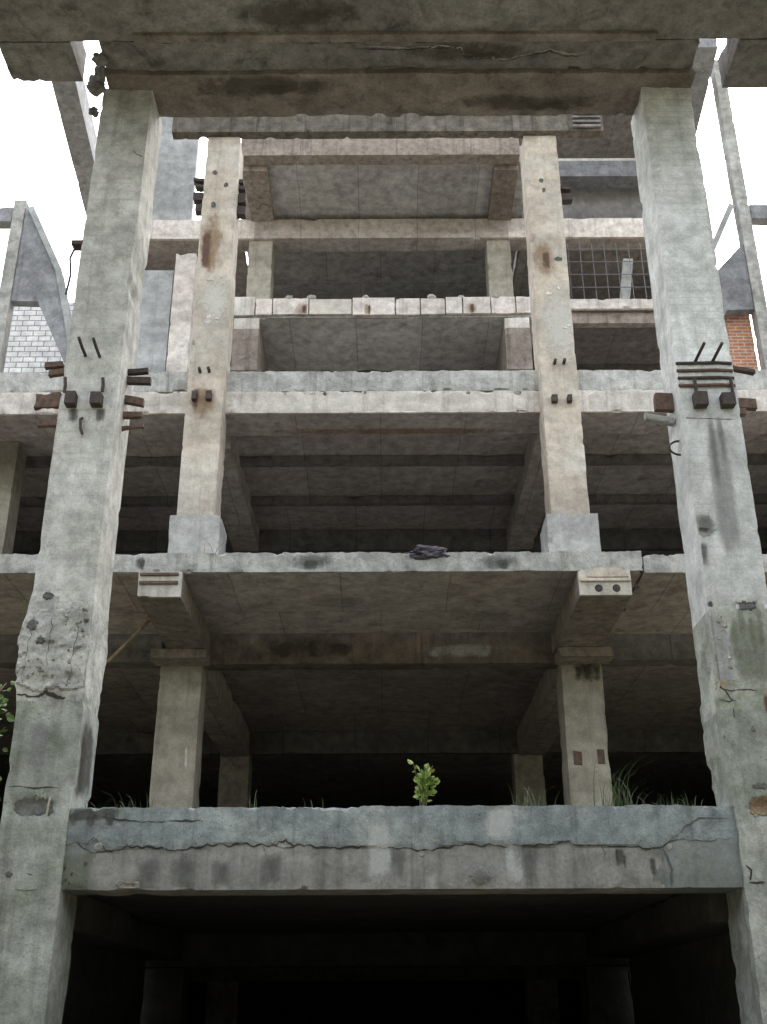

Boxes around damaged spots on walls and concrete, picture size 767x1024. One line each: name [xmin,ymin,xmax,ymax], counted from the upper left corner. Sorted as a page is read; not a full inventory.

crack [328,42,593,69]
corrosion [202,230,220,266]
corrosion [539,246,550,271]
spalling [15,590,95,693]
crack [720,685,755,717]
spalling [14,793,54,816]
spalling [746,782,767,817]
crack [67,817,722,887]